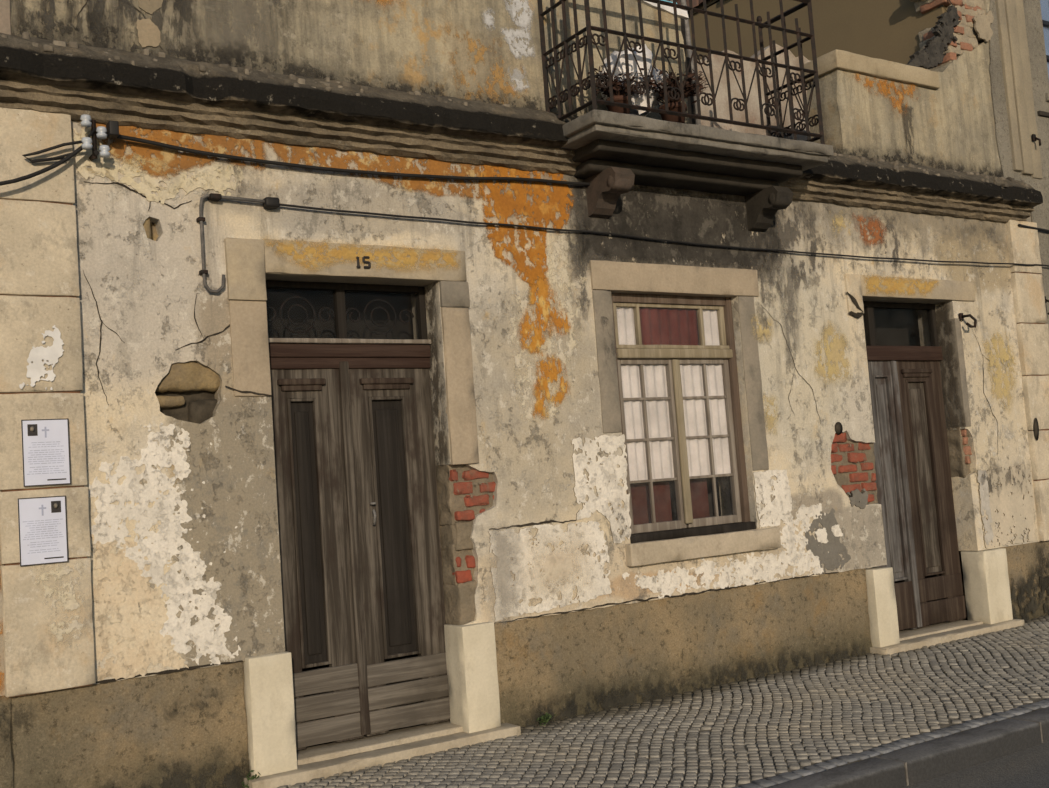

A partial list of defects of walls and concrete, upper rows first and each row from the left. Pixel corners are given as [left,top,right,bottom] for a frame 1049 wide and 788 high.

leakage [17,0,118,49]
leakage [118,0,335,80]
flaking render [910,0,994,70]
leakage [348,78,444,96]
peeling [73,124,244,205]
peeling [19,325,64,390]
crack [83,270,125,405]
peeling [88,361,241,681]
flaking render [441,543,476,585]
flaking render [436,464,496,526]
peeling [622,503,851,598]
flaking render [831,422,878,509]